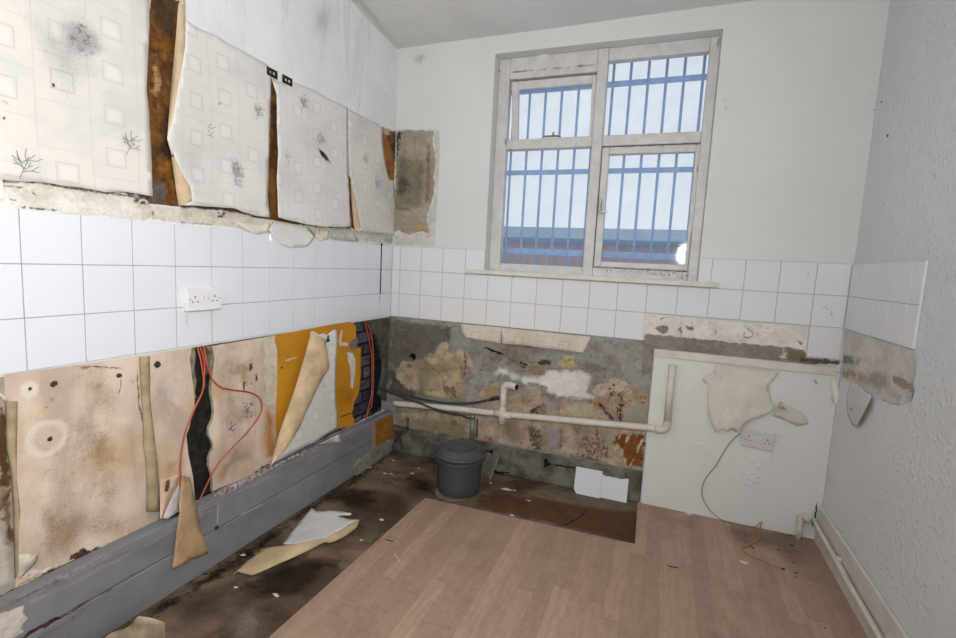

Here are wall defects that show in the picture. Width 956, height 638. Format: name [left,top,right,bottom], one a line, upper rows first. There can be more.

flaking render [0,0,393,244]
flaking render [382,127,396,180]
flaking render [319,315,916,499]
corrosion [613,433,645,468]
spalling [22,543,109,584]
peeling [160,474,209,569]